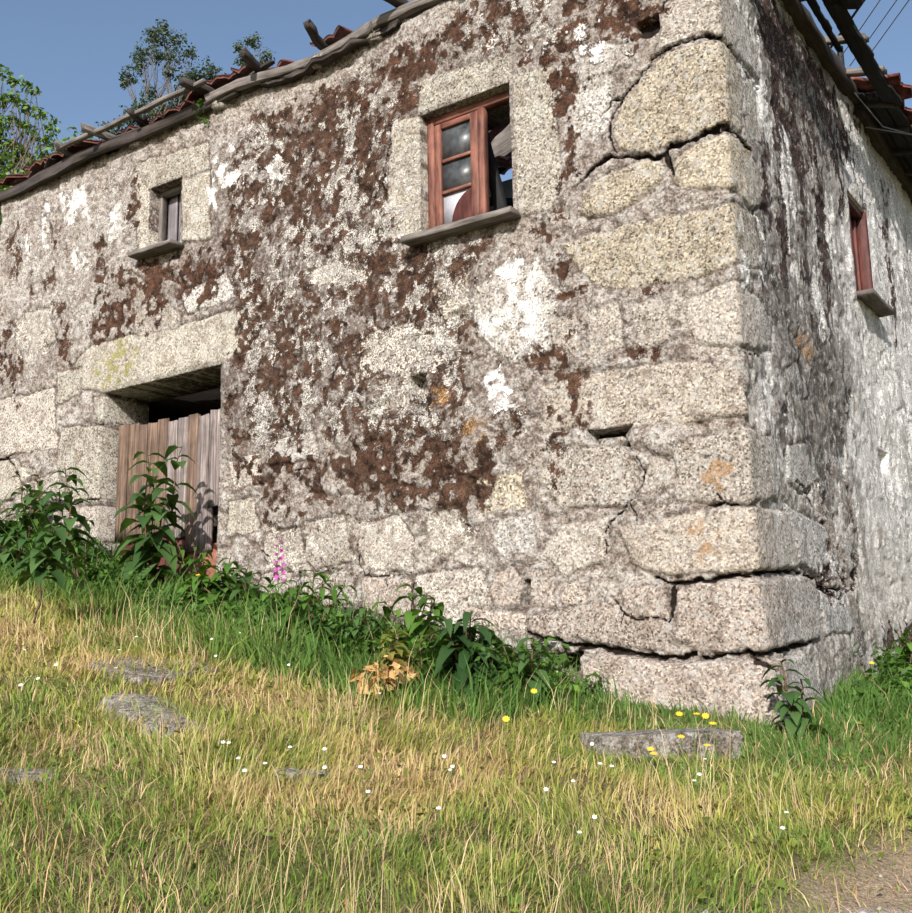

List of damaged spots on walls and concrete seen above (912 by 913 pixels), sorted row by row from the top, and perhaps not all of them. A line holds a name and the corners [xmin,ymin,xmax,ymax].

crack [581,34,751,183]
damp [89,0,673,549]
damp [752,0,912,521]
crack [605,456,646,554]
crack [709,494,739,507]
crack [527,630,812,676]
crack [614,569,849,624]
damp [880,619,912,670]